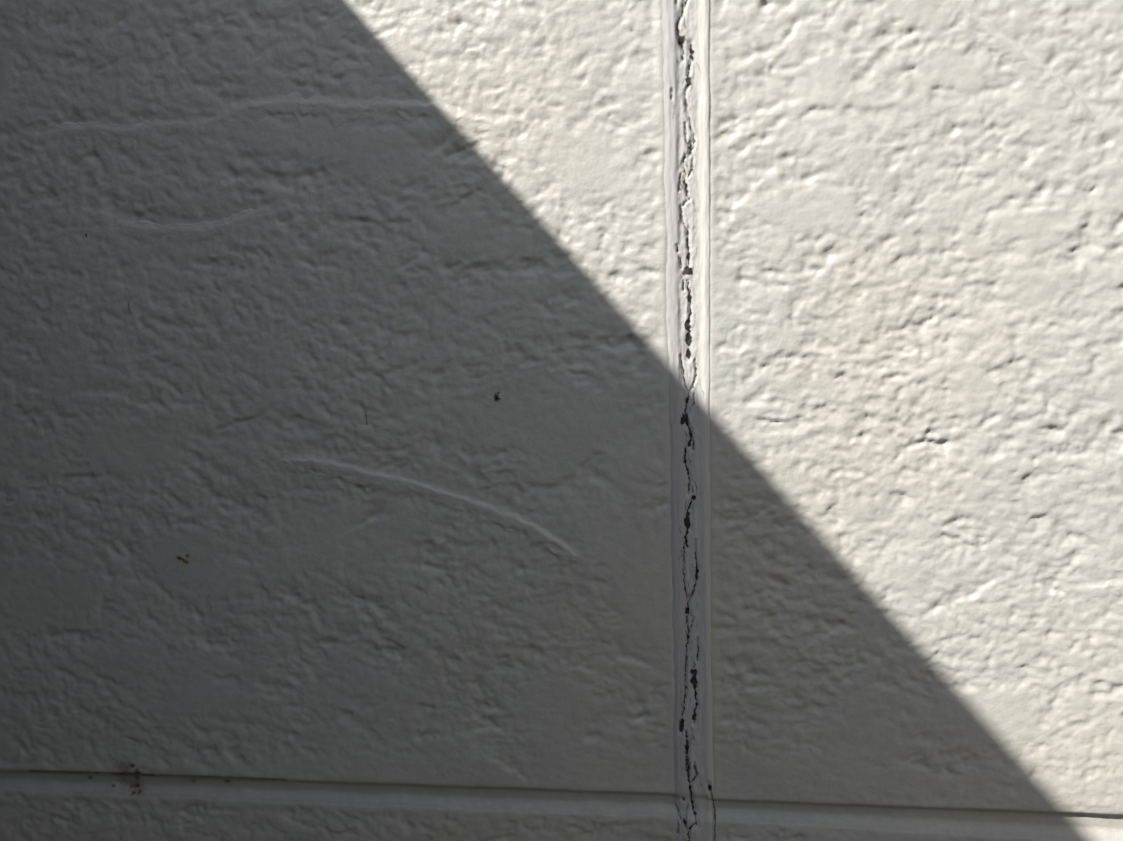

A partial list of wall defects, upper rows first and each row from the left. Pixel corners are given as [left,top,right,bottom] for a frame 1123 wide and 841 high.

crack [670,0,716,841]